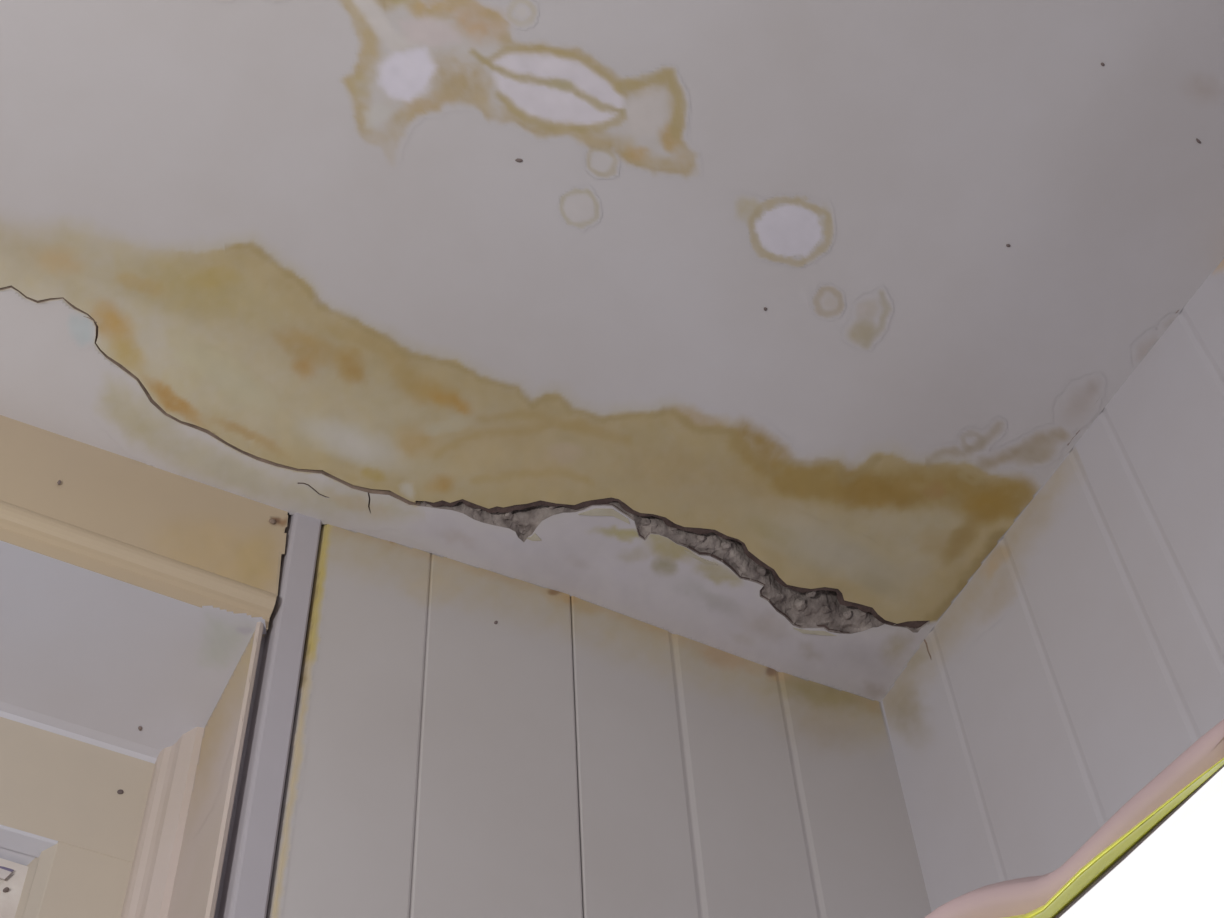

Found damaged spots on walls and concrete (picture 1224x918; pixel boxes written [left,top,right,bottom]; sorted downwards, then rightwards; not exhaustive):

water stain [325,0,704,232]
crack [0,286,420,513]
water stain [0,191,1107,918]
flaking render [416,497,929,636]